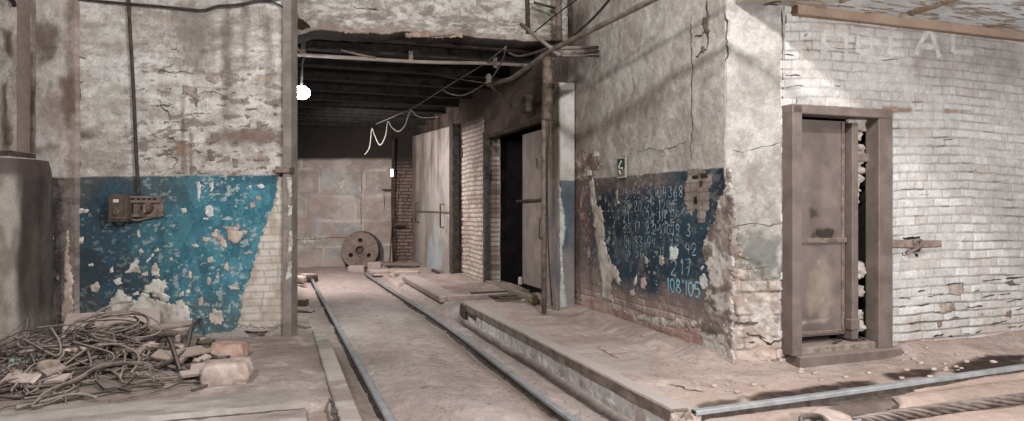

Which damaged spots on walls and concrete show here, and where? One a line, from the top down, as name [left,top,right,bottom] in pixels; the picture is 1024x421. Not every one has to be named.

leakage [35,24,57,61]
flaking render [182,75,220,110]
crack [638,1,709,152]
peeling [788,0,1024,32]
flaking render [105,166,326,331]
flaking render [559,149,783,364]